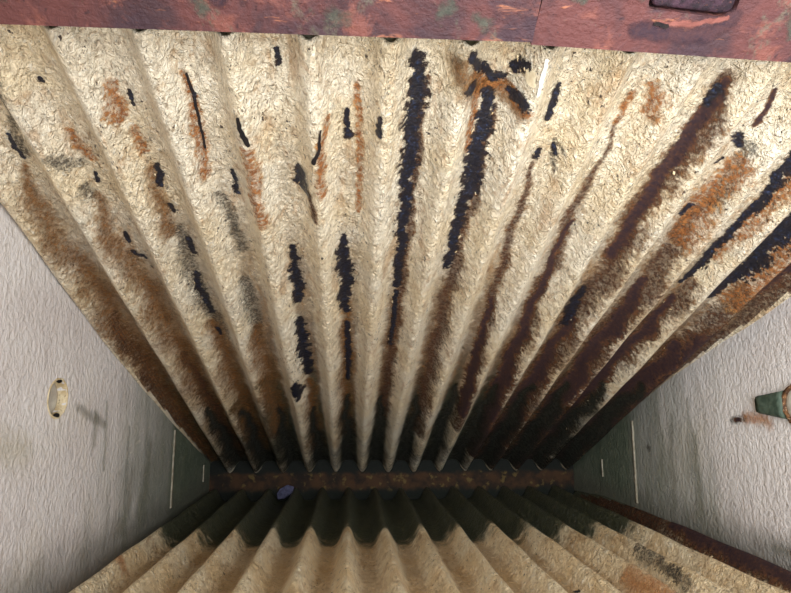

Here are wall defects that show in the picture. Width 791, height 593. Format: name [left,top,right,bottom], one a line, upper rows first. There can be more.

corrosion [629,9,741,45]
leakage [450,55,524,120]
corrosion [464,61,535,152]
corrosion [0,70,242,462]
corrosion [615,264,791,424]
corrosion [581,494,791,593]